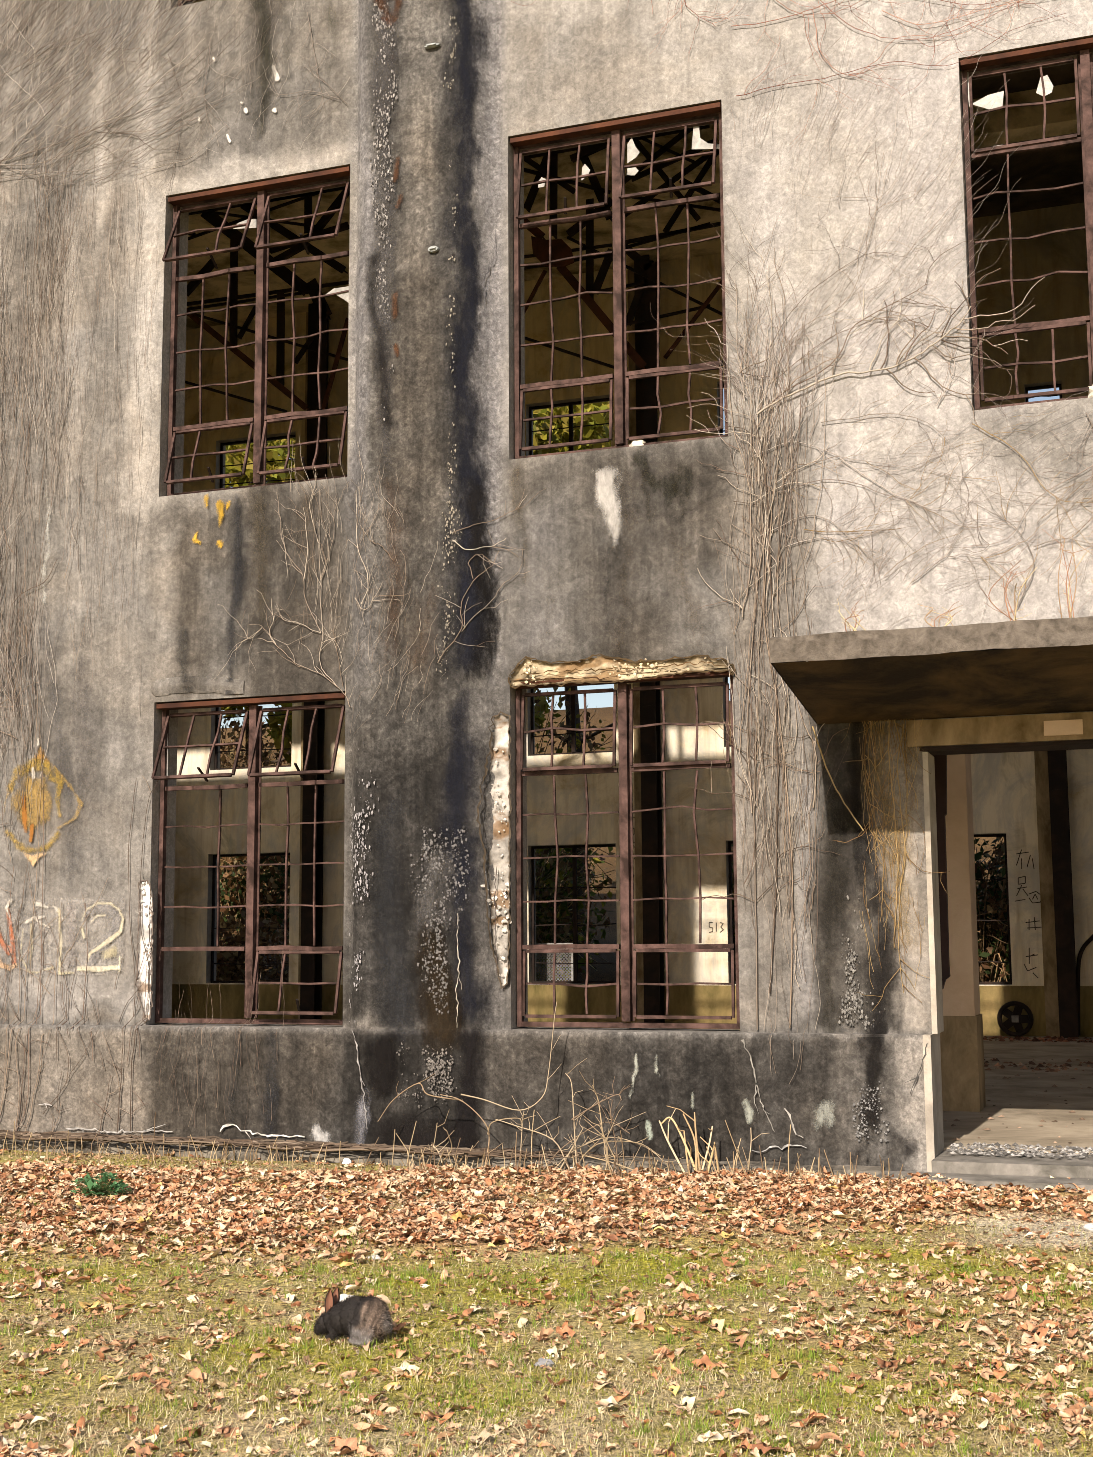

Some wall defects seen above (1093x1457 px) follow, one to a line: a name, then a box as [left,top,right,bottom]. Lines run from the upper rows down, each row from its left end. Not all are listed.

leakage [445,0,500,673]
spalling [508,654,736,689]
spalling [135,880,154,1023]
leakage [359,693,487,1148]
spalling [410,711,512,1014]
leakage [313,1126,328,1142]
leakage [744,1100,754,1156]
leakage [817,1104,833,1124]